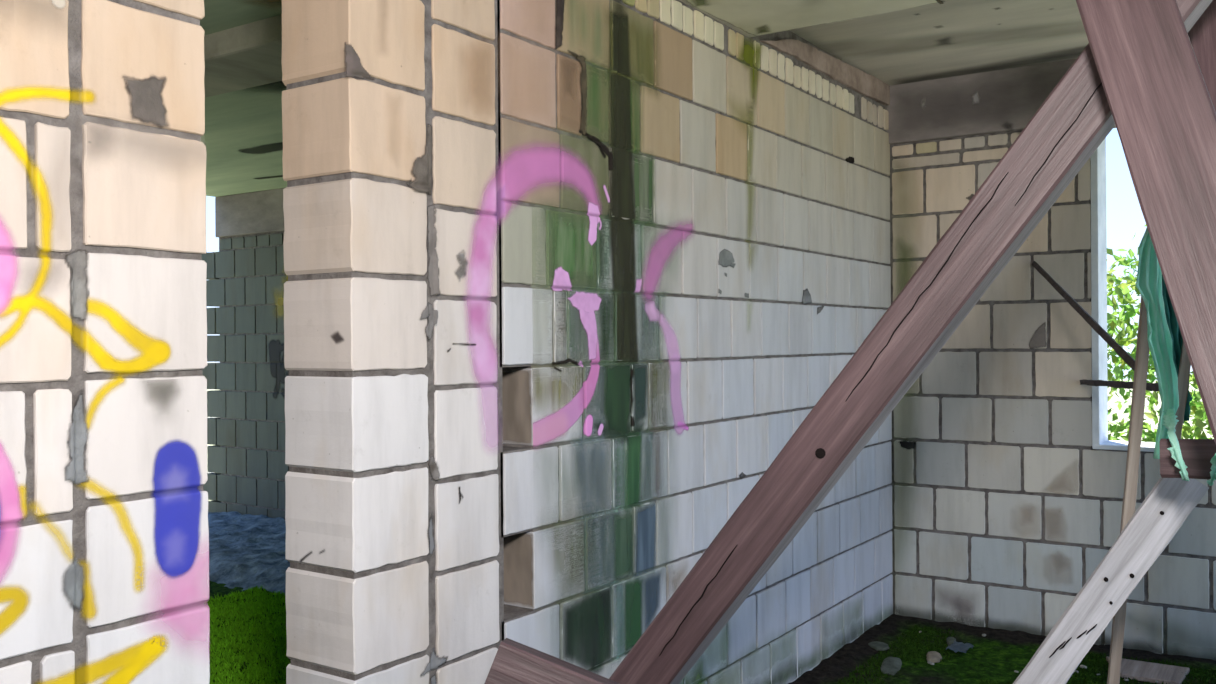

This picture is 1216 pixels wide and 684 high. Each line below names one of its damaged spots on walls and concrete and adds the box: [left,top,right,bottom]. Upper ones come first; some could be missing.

leakage [536,10,676,672]
leakage [741,26,768,102]